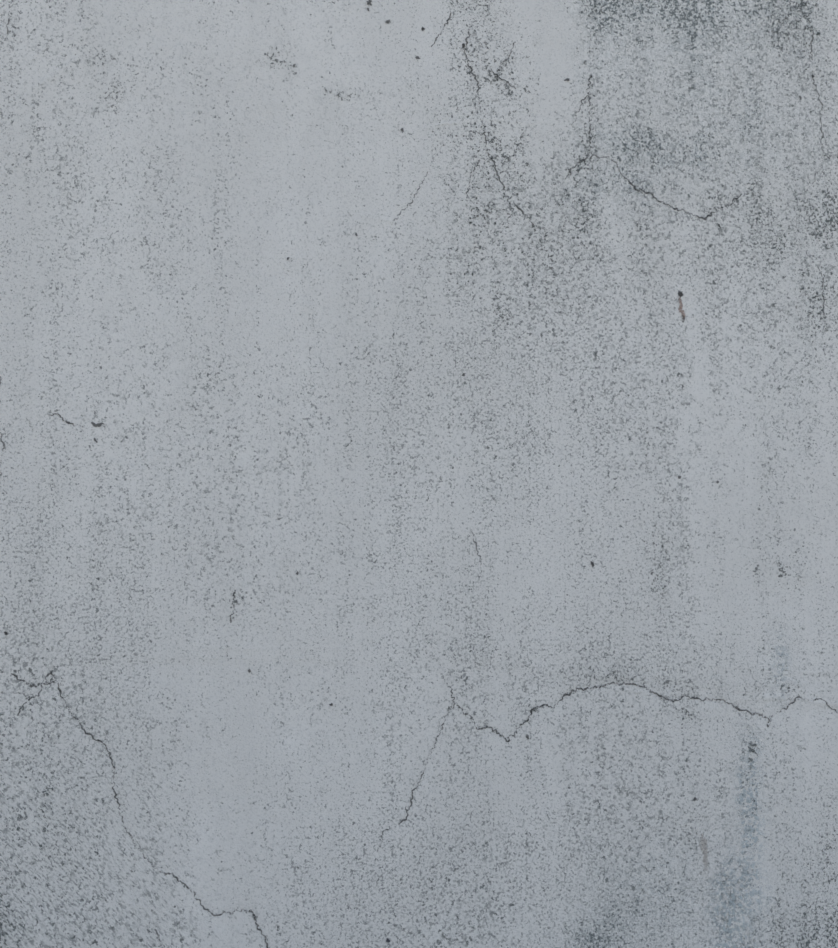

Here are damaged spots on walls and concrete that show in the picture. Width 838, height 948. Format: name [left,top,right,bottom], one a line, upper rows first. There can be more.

crack [565,74,742,220]
crack [8,671,268,948]
crack [380,682,837,847]